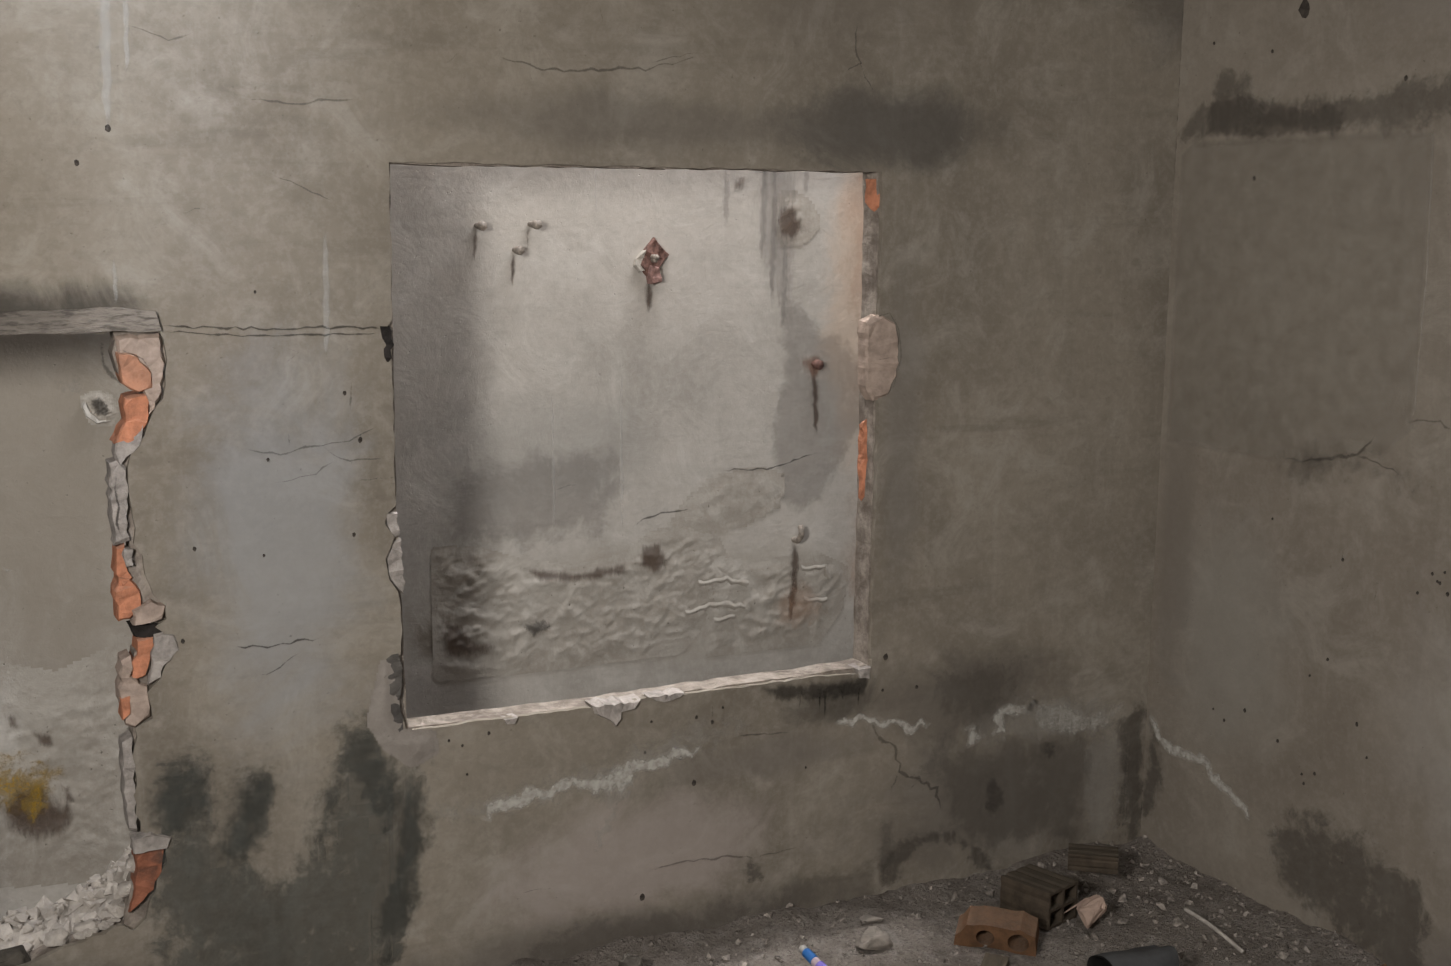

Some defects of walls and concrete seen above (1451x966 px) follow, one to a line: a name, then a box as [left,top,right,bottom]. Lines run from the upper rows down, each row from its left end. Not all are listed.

hole [80,390,119,427]
peeling [113,333,165,417]
peeling [105,457,133,567]
leakage [0,756,59,823]
spalling [0,599,185,889]
efflorescence [486,747,699,818]
leakage [839,693,923,734]
efflorescence [969,705,1105,745]
leakage [1152,719,1248,817]